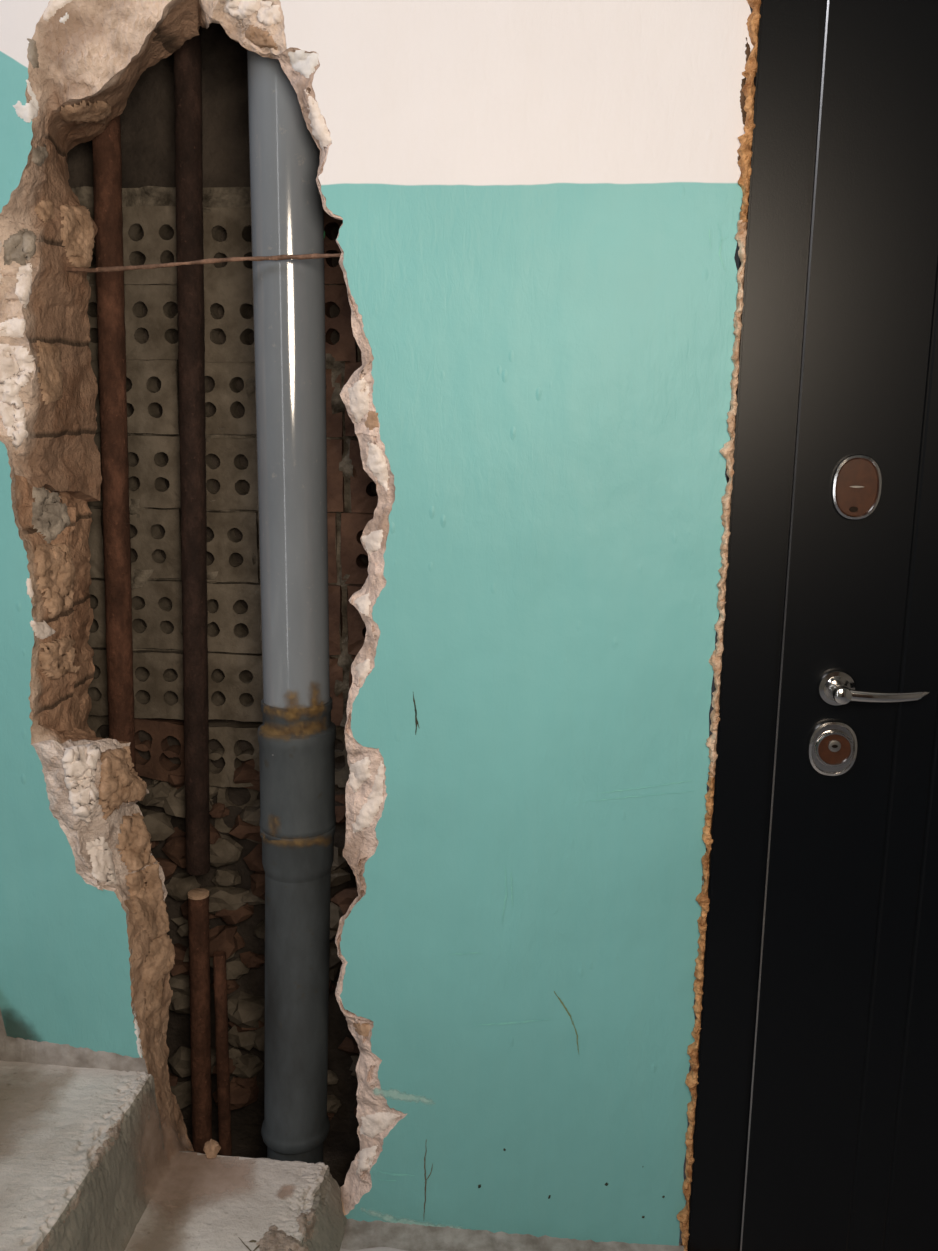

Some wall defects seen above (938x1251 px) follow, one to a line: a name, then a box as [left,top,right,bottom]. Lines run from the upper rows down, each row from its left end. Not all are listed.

spalling [0,0,199,1151]
spalling [88,1114,124,1173]
spalling [273,47,408,1215]